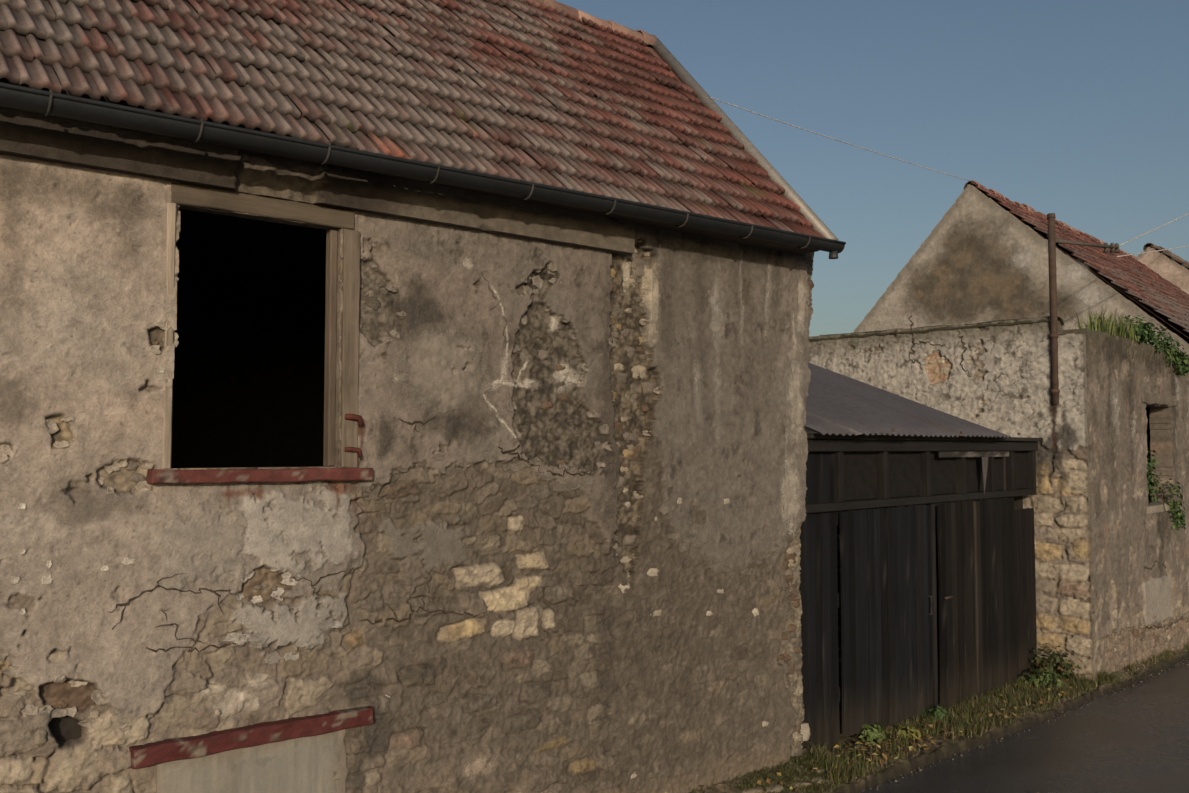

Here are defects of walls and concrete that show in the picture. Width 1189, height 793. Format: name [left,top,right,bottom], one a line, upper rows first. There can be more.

spalling [359,253,406,347]
spalling [148,319,179,374]
crack [482,274,595,477]
spalling [921,350,952,385]
spalling [36,415,74,448]
spalling [506,239,661,587]
spalling [97,457,156,494]
peeling [42,560,54,584]
spalling [236,565,297,604]
crack [110,573,243,653]
flaking render [223,620,310,665]
spalling [5,674,131,733]